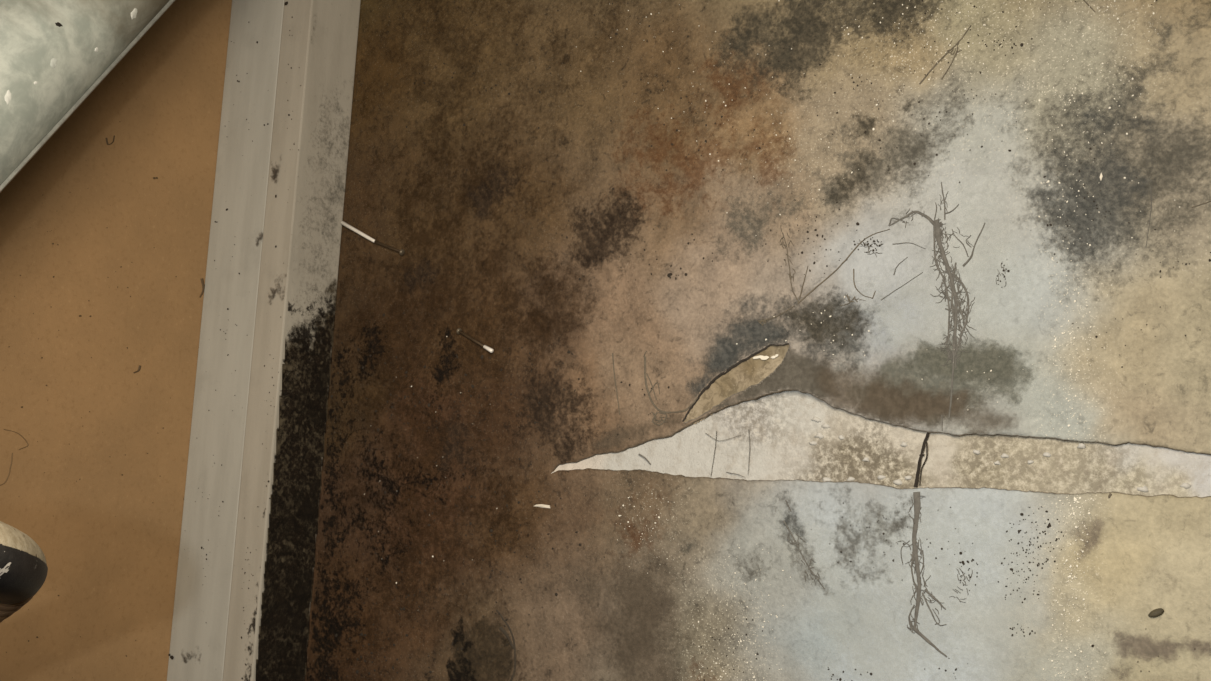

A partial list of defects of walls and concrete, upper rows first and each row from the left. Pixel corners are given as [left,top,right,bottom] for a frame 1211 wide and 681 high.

damp [721,0,958,90]
damp [556,188,687,280]
damp [767,89,996,280]
damp [1036,99,1211,272]
damp [245,181,602,681]
peeling [552,389,1211,498]
crack [914,432,929,487]
damp [998,506,1064,603]